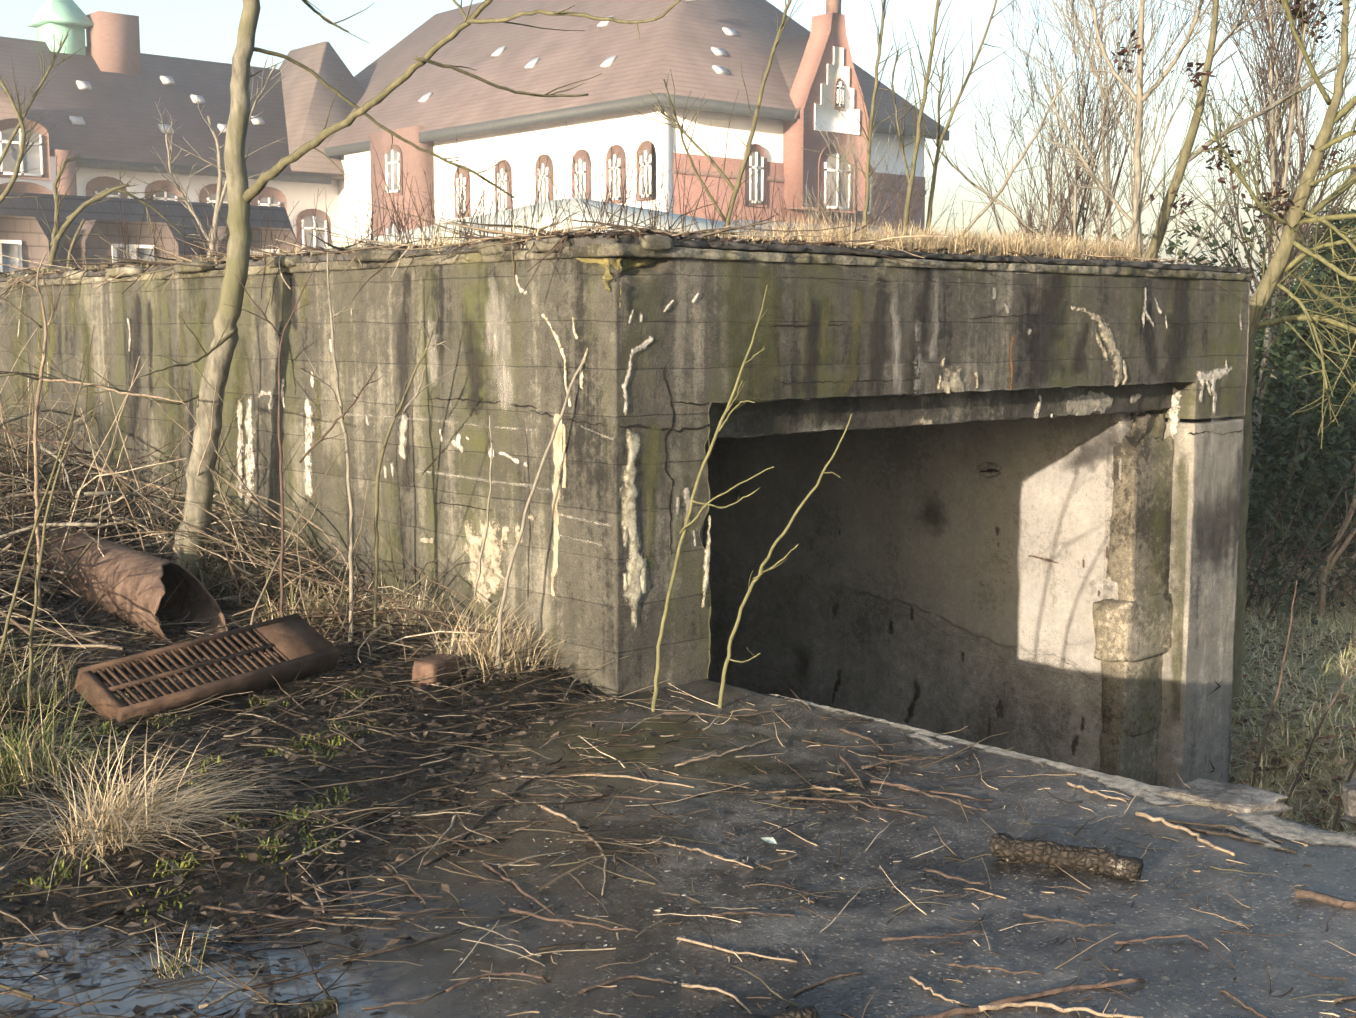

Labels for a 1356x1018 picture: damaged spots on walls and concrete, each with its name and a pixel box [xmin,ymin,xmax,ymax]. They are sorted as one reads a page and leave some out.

water stain [127,295,152,437]
crack [427,314,718,556]
water stain [622,337,654,415]
water stain [1025,275,1064,418]
spalling [1066,306,1141,416]
peeling [1199,360,1228,414]
spalling [464,515,535,607]
spalling [1225,812,1356,849]